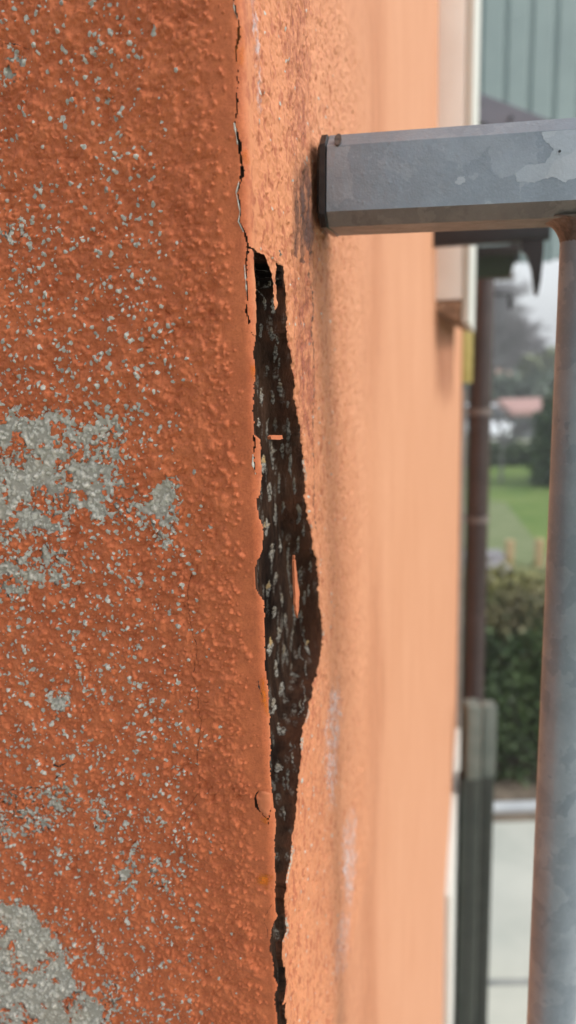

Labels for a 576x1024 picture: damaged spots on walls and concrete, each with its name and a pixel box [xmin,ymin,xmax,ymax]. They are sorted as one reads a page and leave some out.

crack [233,0,252,333]
peeling [0,405,183,604]
flaking render [252,248,325,1024]
peeling [0,897,127,1024]